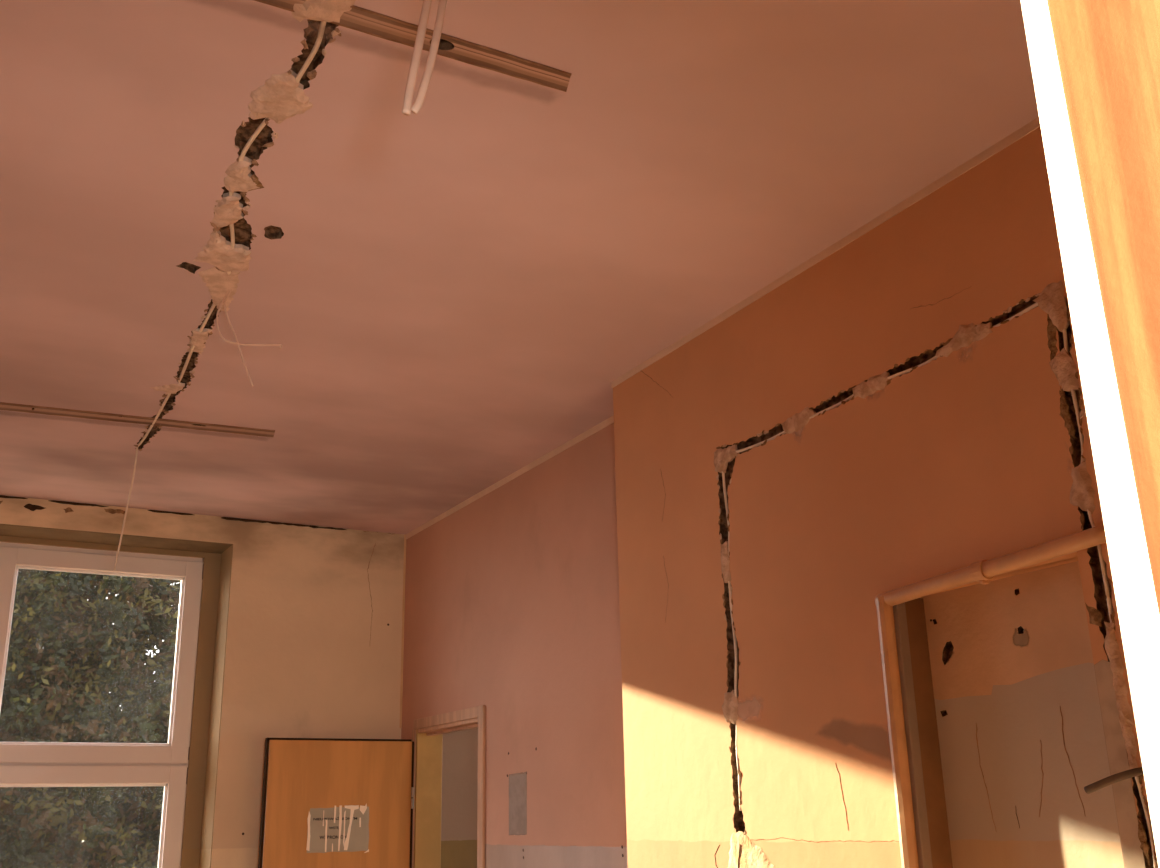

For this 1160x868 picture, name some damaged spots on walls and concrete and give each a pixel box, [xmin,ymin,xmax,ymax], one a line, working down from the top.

spalling [234,145,264,215]
spalling [1047,307,1073,360]
spalling [1059,372,1086,466]
crack [976,707,1085,829]